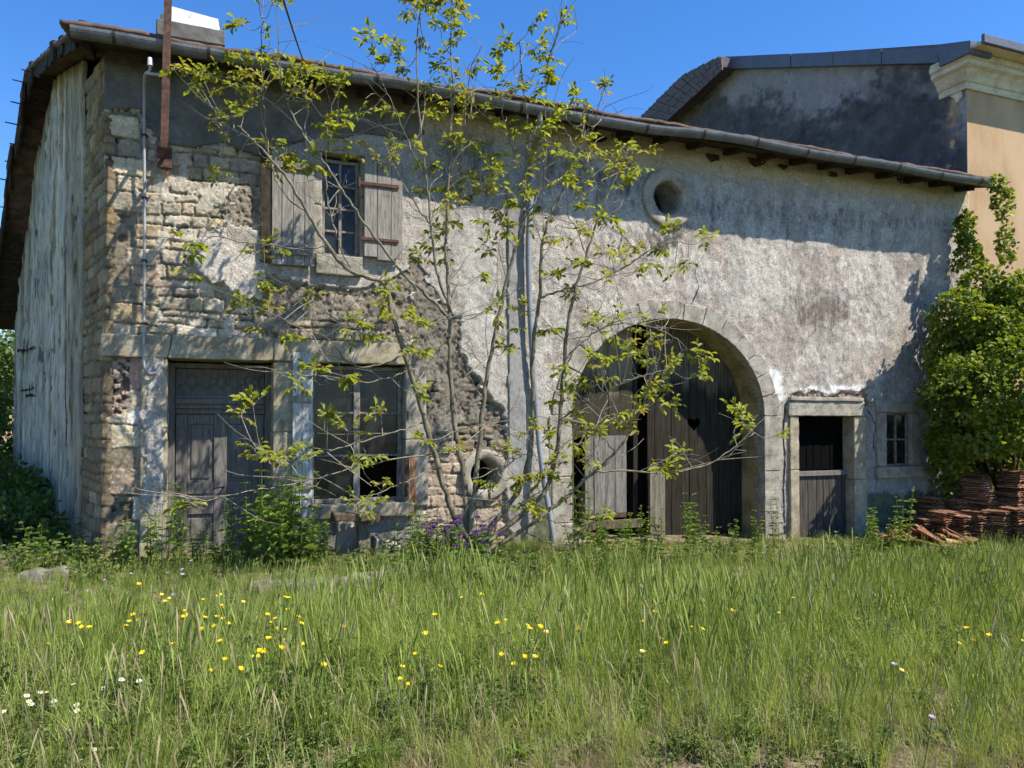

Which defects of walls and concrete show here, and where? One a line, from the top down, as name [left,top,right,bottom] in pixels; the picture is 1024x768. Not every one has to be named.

flaking render [101,109,510,561]
damp [690,64,967,173]